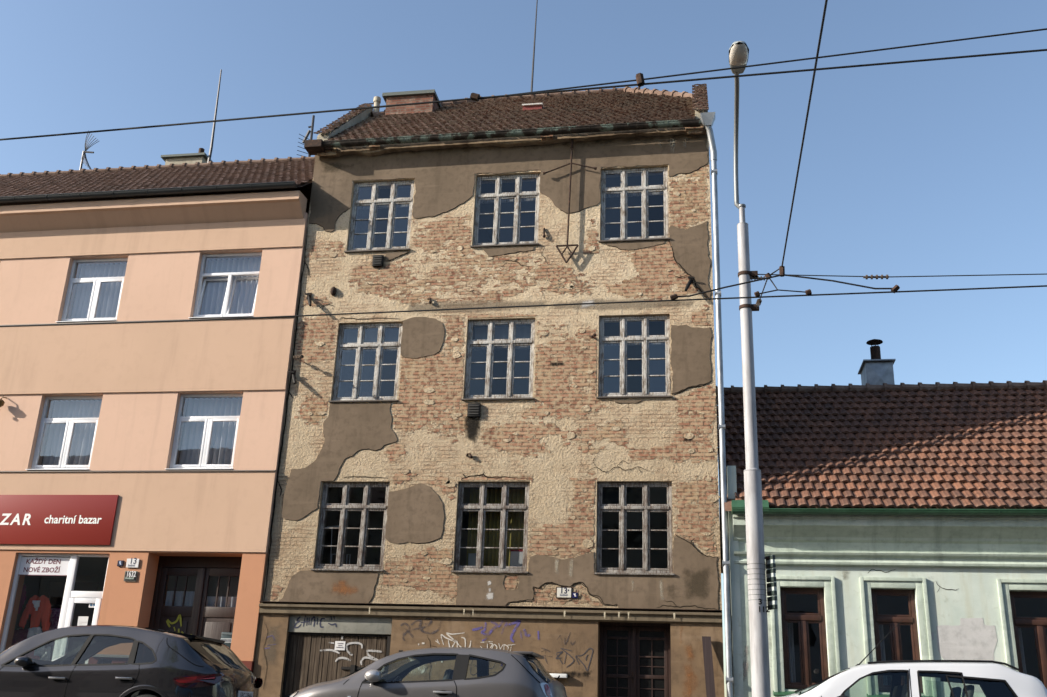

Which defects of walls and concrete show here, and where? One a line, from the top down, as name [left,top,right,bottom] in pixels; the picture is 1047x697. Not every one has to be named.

peeling [271,126,720,611]
crack [588,458,652,473]
crack [512,582,616,606]